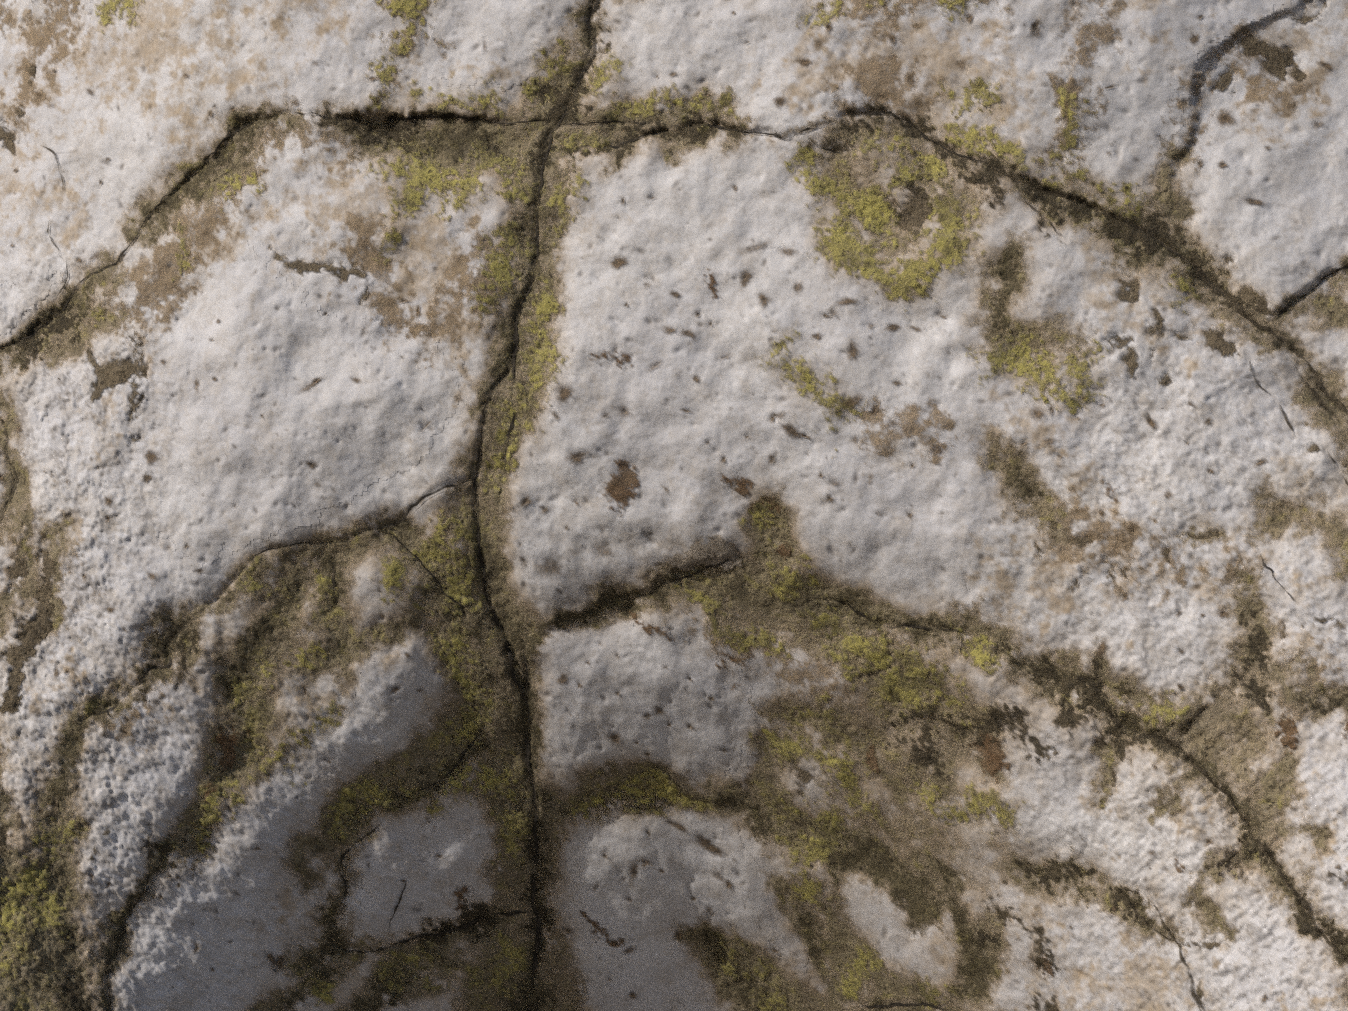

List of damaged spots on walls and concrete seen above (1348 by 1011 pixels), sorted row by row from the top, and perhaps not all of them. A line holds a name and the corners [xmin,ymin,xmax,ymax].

crack [0,123,251,348]
water stain [105,120,352,330]
water stain [860,397,954,464]
crack [1025,182,1348,436]
water stain [1219,308,1348,428]
crack [229,0,1013,1011]
water stain [1049,487,1205,596]
crack [1260,554,1293,599]
crack [1096,664,1348,963]
water stain [1215,701,1267,792]
water stain [766,875,851,1011]
crack [1116,881,1204,1009]